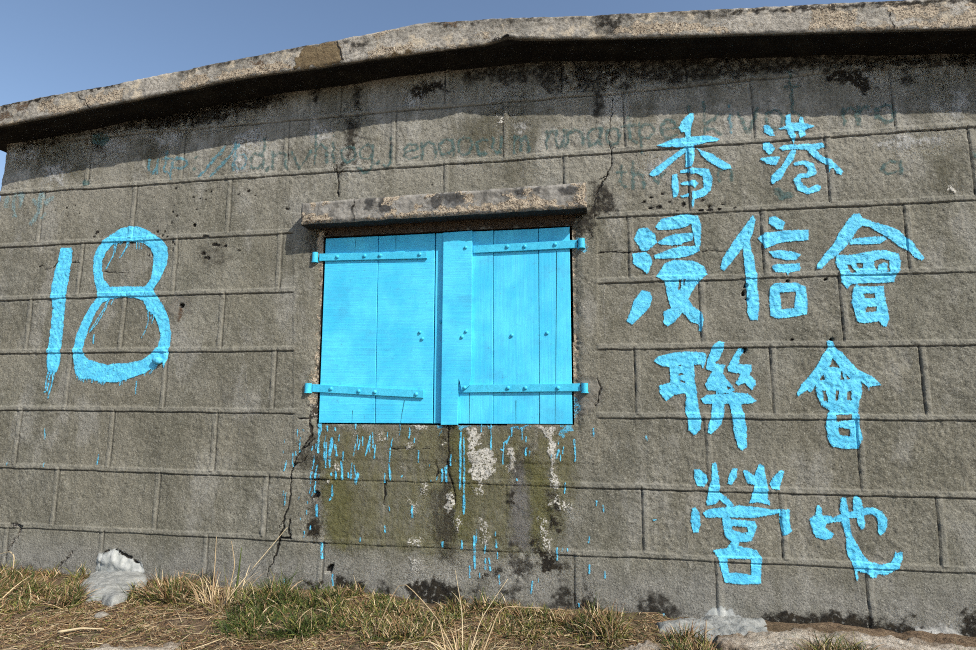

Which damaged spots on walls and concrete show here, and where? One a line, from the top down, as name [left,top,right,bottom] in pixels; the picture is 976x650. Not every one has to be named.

leakage [411,81,449,99]
leakage [464,54,976,117]
crack [587,98,639,253]
crack [267,415,315,577]
leakage [431,431,472,542]
leakage [473,425,599,610]
crack [6,523,23,559]
leakage [299,576,364,593]
leakage [405,576,462,604]
leakage [638,594,680,619]
leakage [762,610,923,633]
leakage [961,607,976,637]